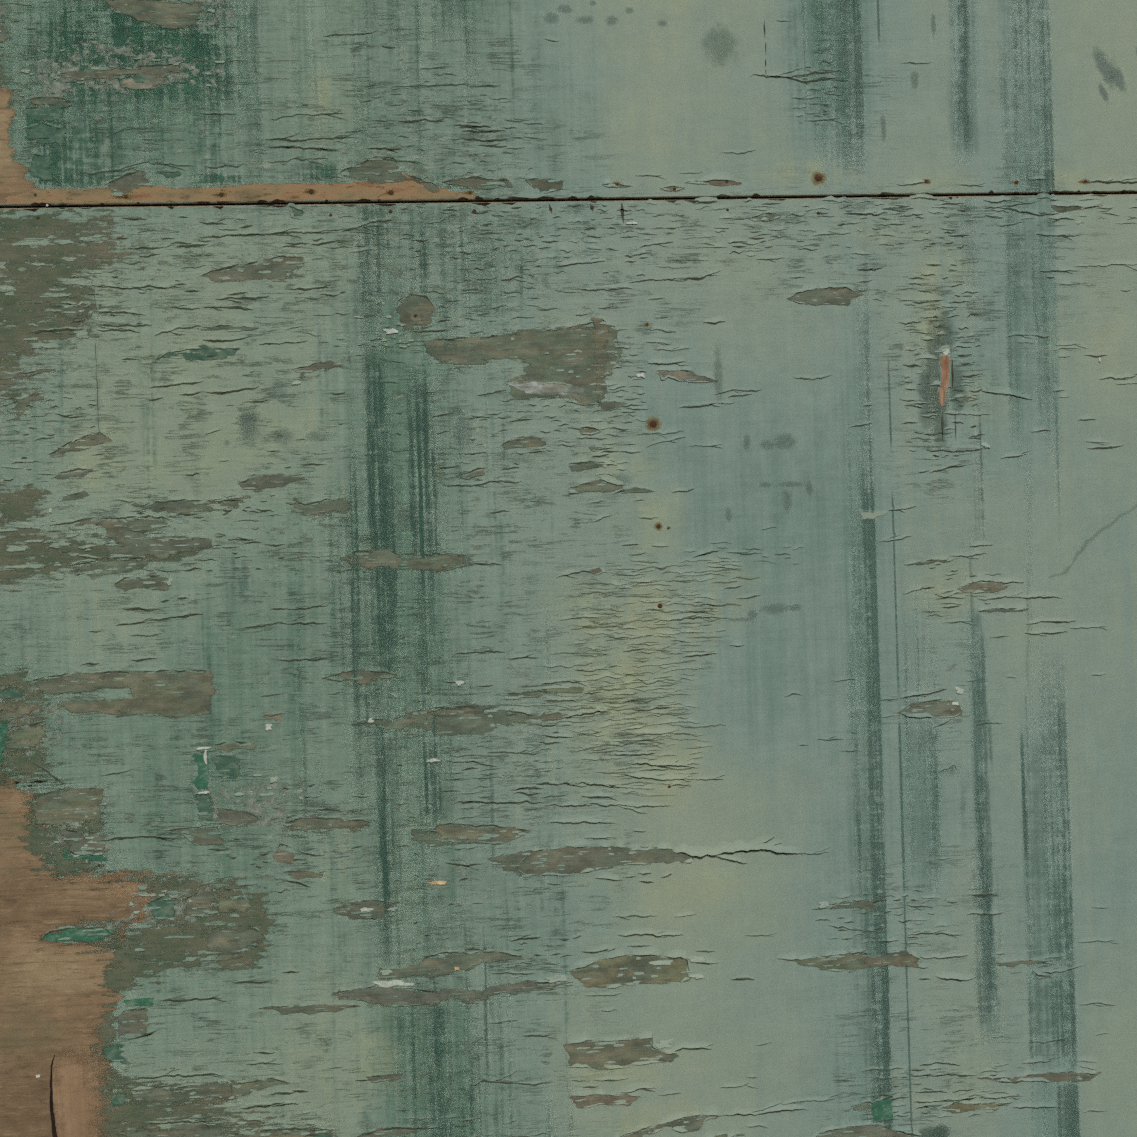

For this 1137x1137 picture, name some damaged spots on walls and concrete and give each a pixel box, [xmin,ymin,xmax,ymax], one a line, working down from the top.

peeling [0,18,182,420]
peeling [200,252,304,282]
peeling [787,280,863,306]
peeling [375,290,626,410]
peeling [0,429,354,592]
water stain [864,499,890,1092]
peeling [411,819,694,877]
peeling [0,665,332,1137]
peeling [259,947,705,1014]
peeling [564,1031,679,1070]
crack [50,1055,58,1137]
peeling [605,1106,745,1137]